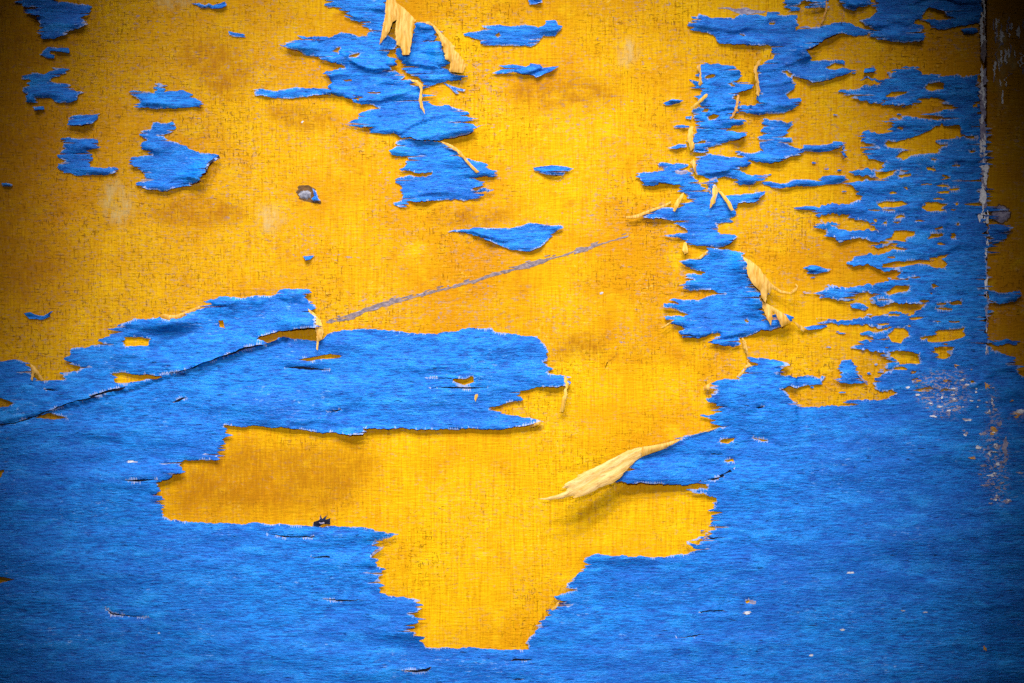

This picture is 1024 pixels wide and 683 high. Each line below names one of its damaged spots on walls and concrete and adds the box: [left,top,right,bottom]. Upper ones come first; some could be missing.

peeling [14,0,92,110]
peeling [130,83,202,109]
peeling [254,0,498,207]
peeling [464,20,562,47]
peeling [493,63,558,77]
peeling [57,113,220,191]
peeling [626,0,983,353]
peeling [449,223,563,251]
peeling [833,82,1024,504]
crack [170,344,261,373]
crack [0,387,125,426]
peeling [158,360,722,650]